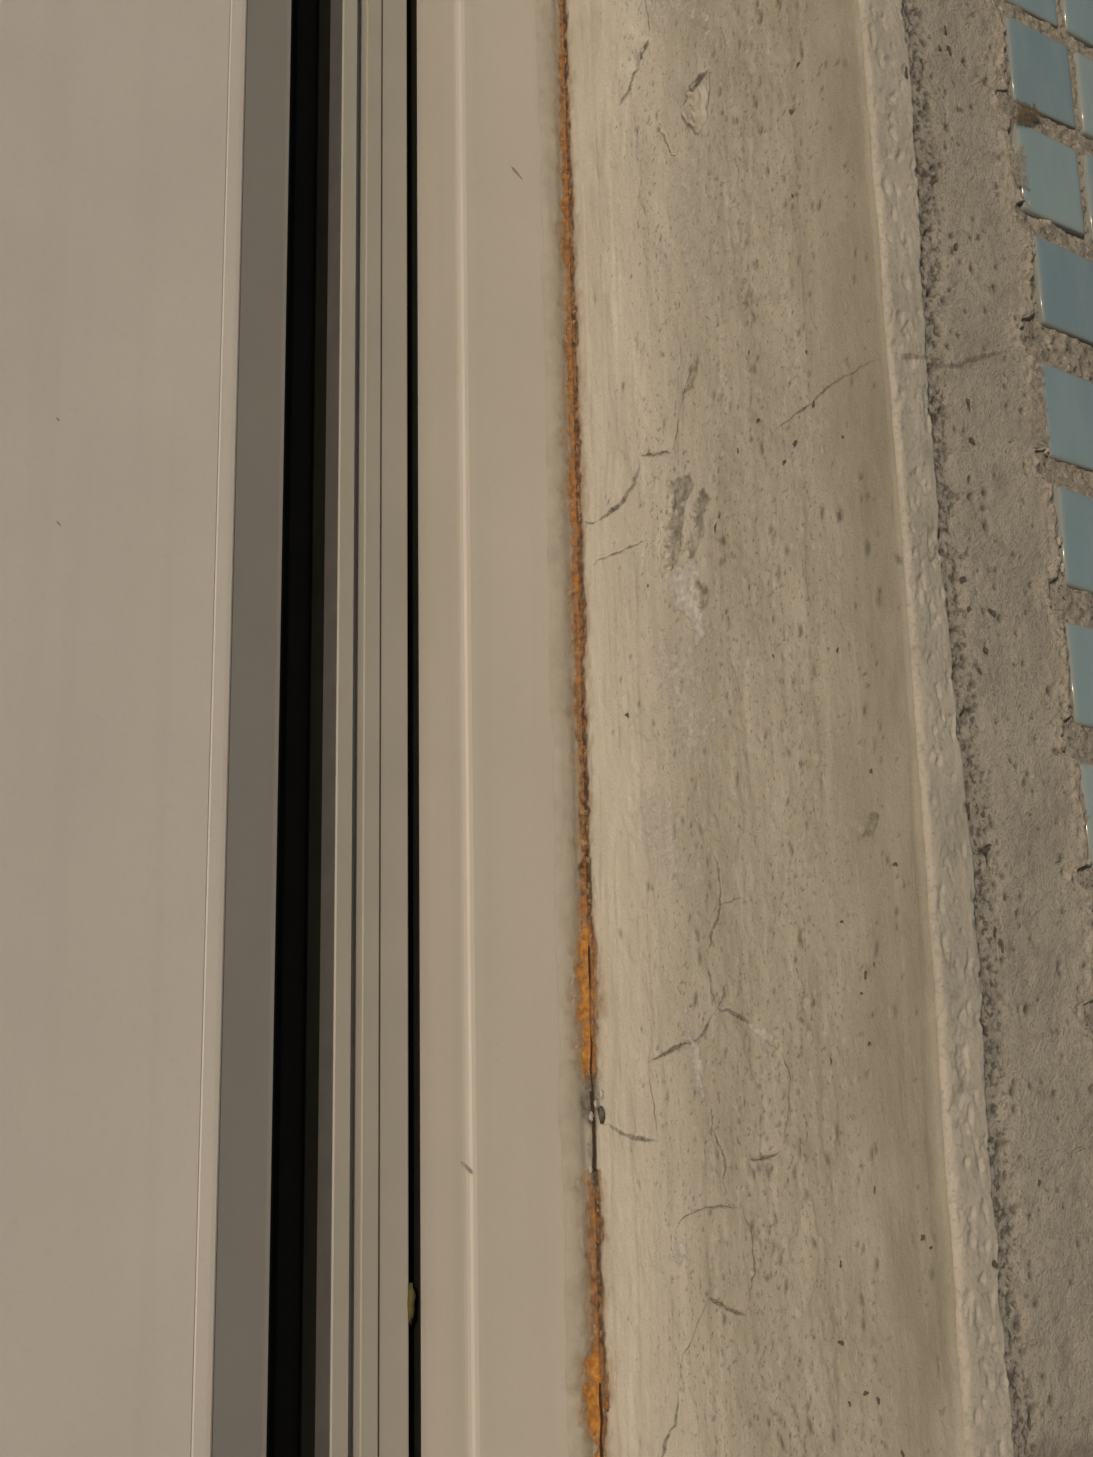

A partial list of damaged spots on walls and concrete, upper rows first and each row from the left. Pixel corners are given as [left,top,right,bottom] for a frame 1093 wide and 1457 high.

corrosion [558,0,601,1091]
crack [619,864,745,1141]
corrosion [583,1169,610,1457]